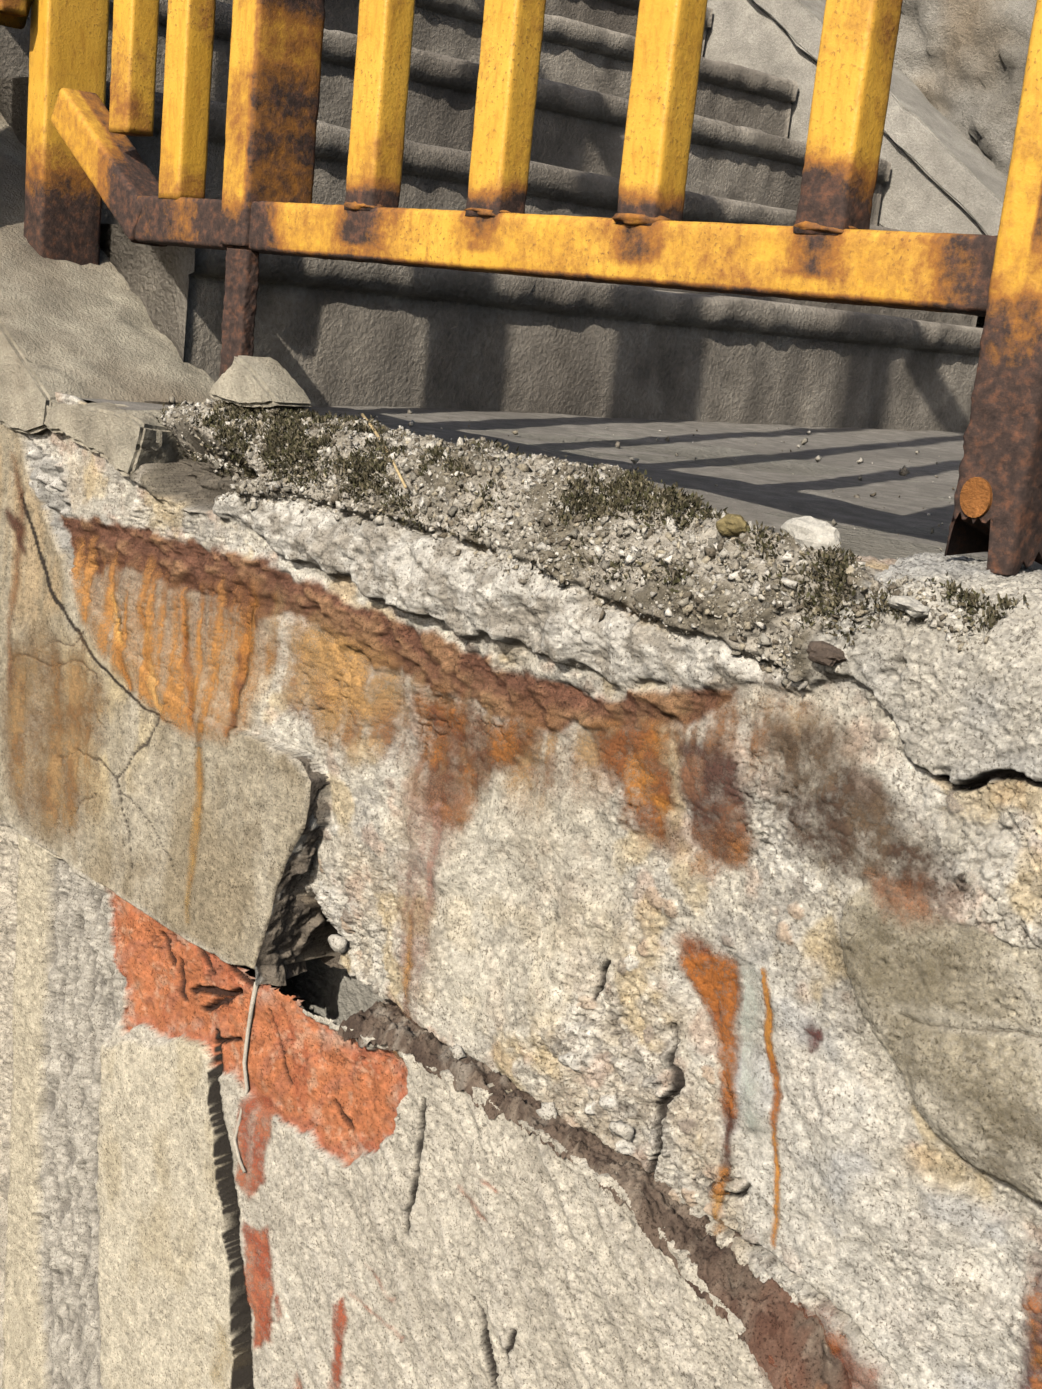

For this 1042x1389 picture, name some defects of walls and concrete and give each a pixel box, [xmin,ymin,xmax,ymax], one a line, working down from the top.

crack [10,493,178,878]
rust [61,516,943,997]
spalling [27,392,1042,1389]
rust [681,939,739,1217]
rust [761,969,781,1245]
crack [901,1013,1040,1037]
crack [939,770,1042,790]